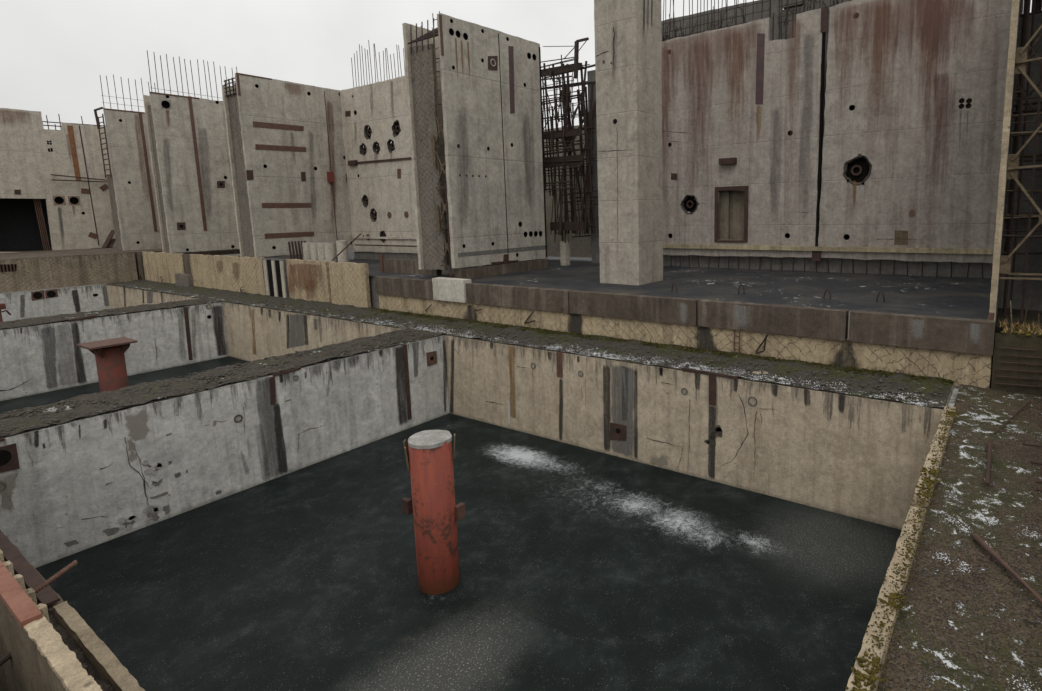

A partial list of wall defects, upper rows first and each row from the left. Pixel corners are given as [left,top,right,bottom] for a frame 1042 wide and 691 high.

crack [100,438,149,517]